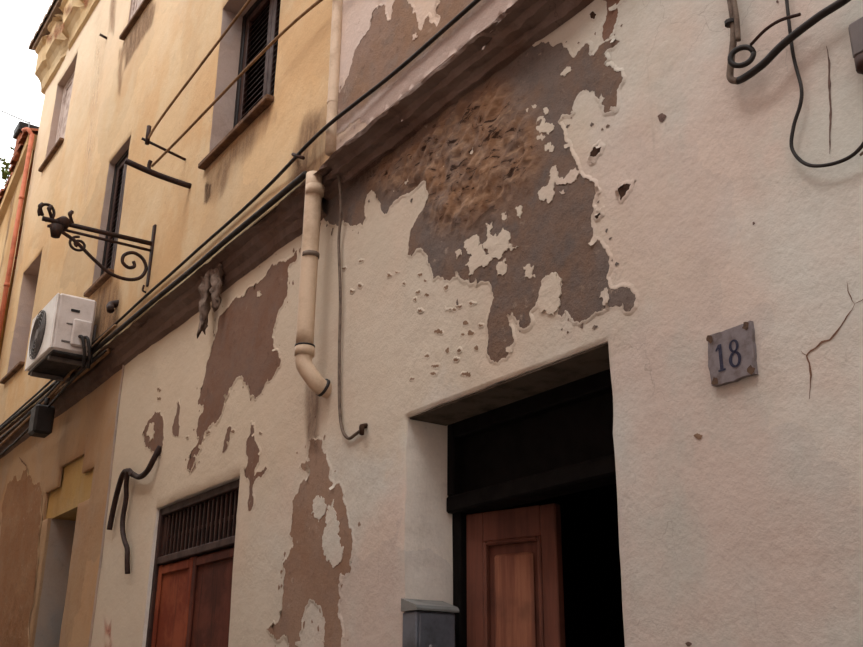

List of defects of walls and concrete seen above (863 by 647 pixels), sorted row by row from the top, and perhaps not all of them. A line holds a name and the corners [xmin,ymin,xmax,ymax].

peeling [320,0,640,379]
peeling [0,469,43,647]
peeling [142,248,301,475]
peeling [244,420,269,514]
peeling [265,435,361,647]
crack [801,283,863,399]